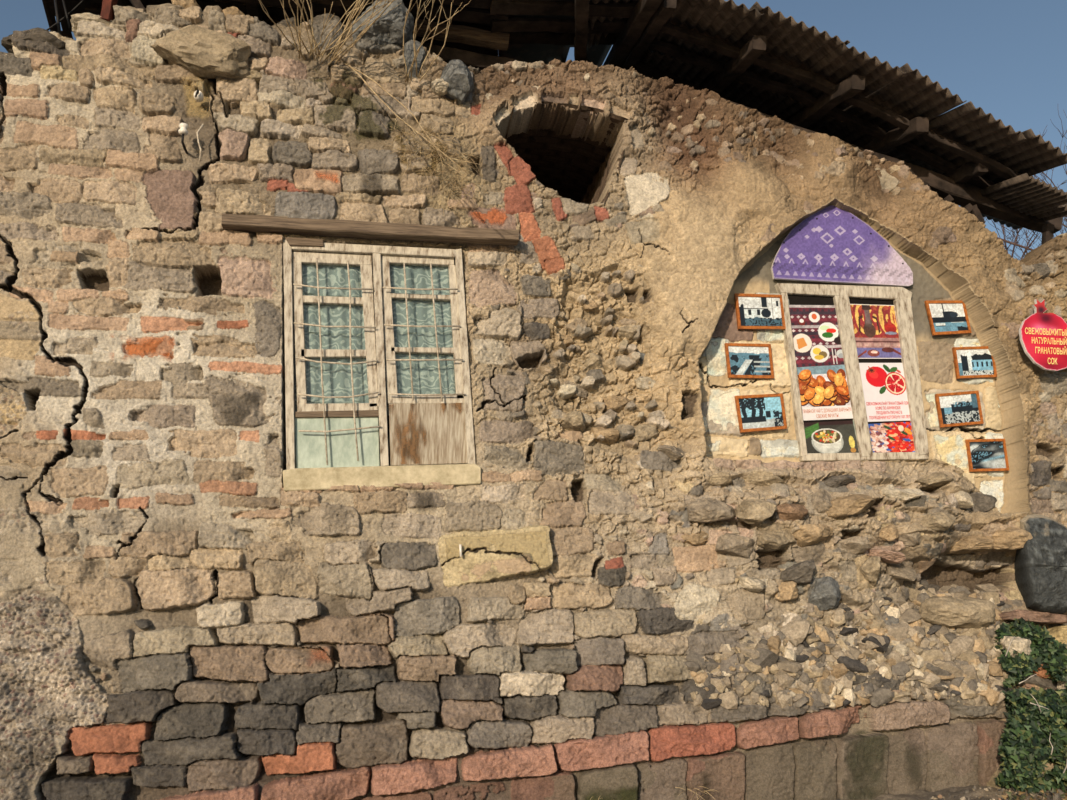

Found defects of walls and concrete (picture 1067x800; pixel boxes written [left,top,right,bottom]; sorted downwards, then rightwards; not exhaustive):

crack [0,71,8,125]
crack [144,78,229,234]
crack [0,234,89,555]
crack [442,547,541,572]